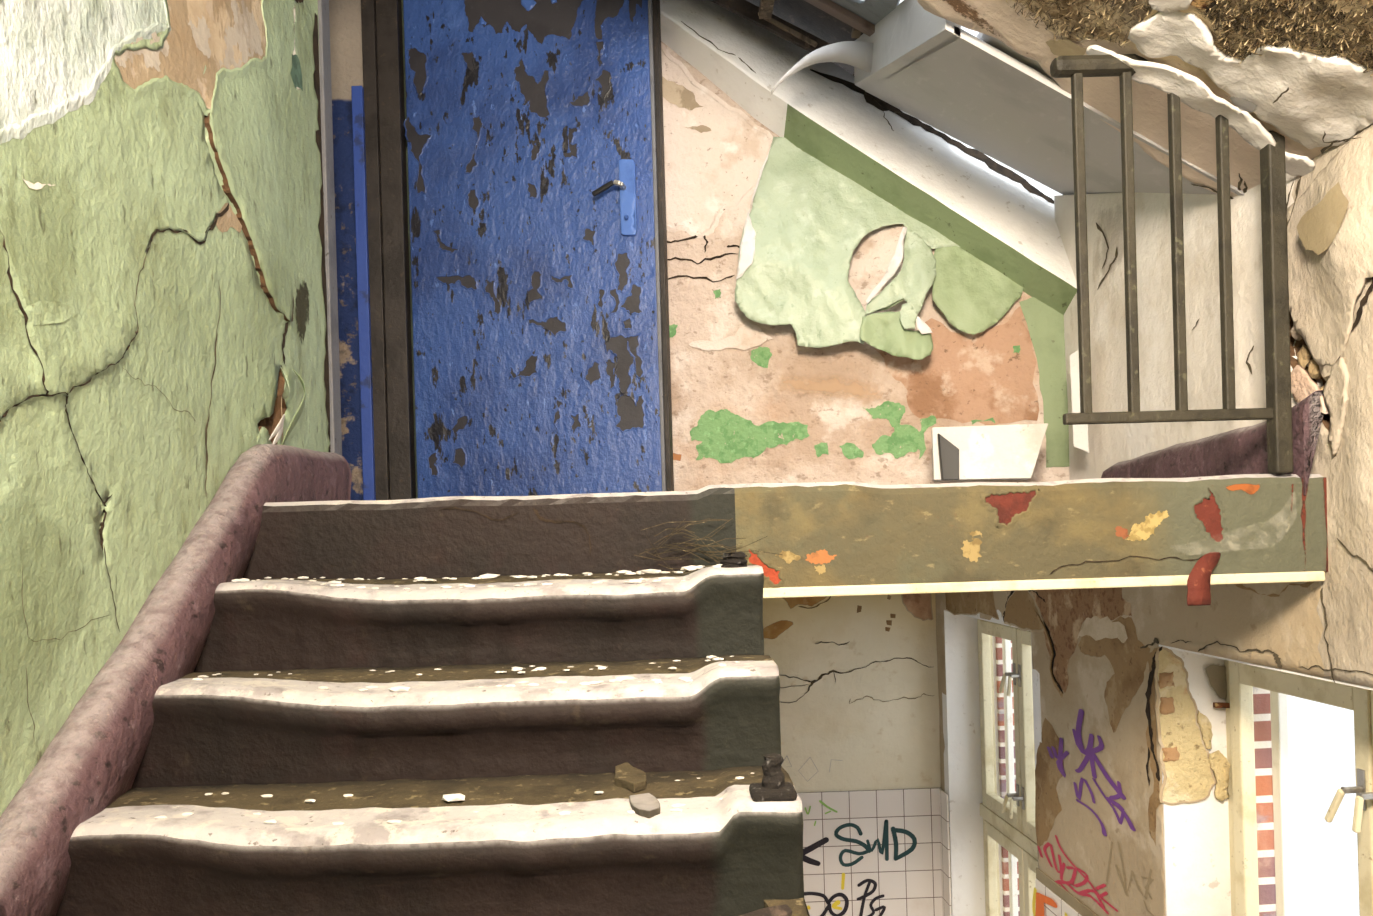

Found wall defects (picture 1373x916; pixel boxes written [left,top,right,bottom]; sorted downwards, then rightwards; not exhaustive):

peeling [0,0,269,144]
peeling [464,0,642,106]
peeling [1006,0,1373,176]
crack [0,113,294,742]
peeling [661,41,1039,459]
crack [1096,223,1118,290]
crack [1246,346,1254,374]
peeling [1289,311,1350,456]
crack [1336,277,1373,362]
crack [780,641,934,704]
spalling [901,587,1230,851]
crack [1140,588,1373,785]